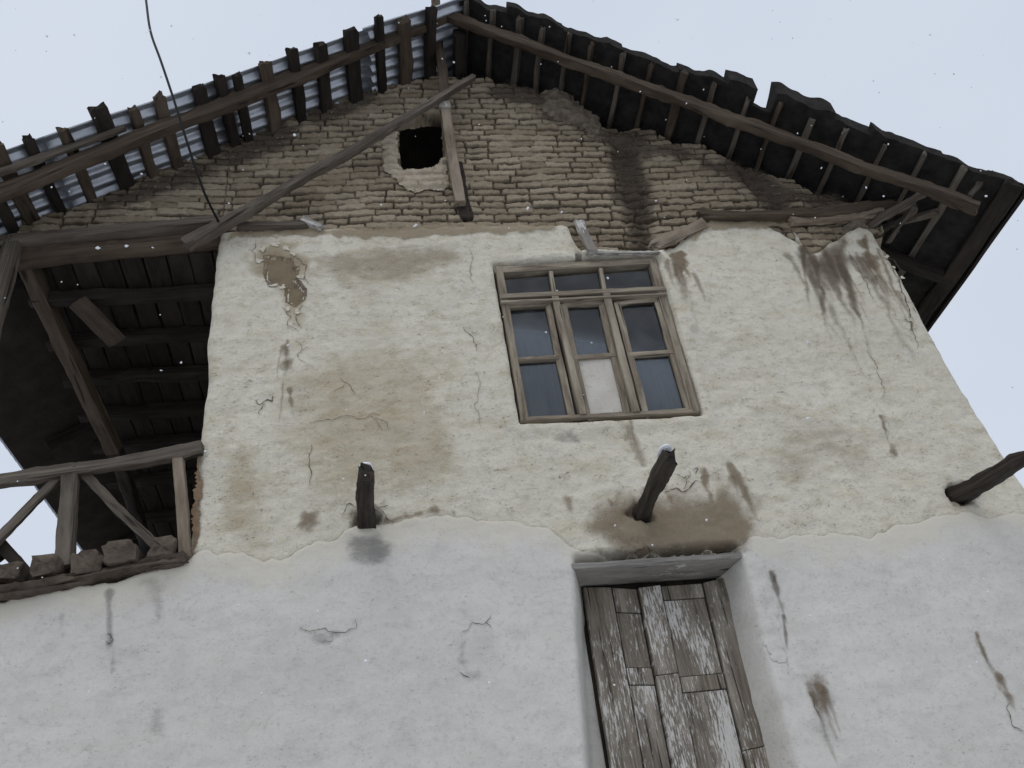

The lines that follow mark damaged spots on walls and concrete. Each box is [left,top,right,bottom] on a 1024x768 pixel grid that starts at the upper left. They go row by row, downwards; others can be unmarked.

spalling [255,242,307,314]
leakage [669,251,688,284]
leakage [800,239,891,315]
crack [880,251,919,348]
crack [308,380,389,483]
leakage [593,463,752,559]
crack [665,468,698,493]